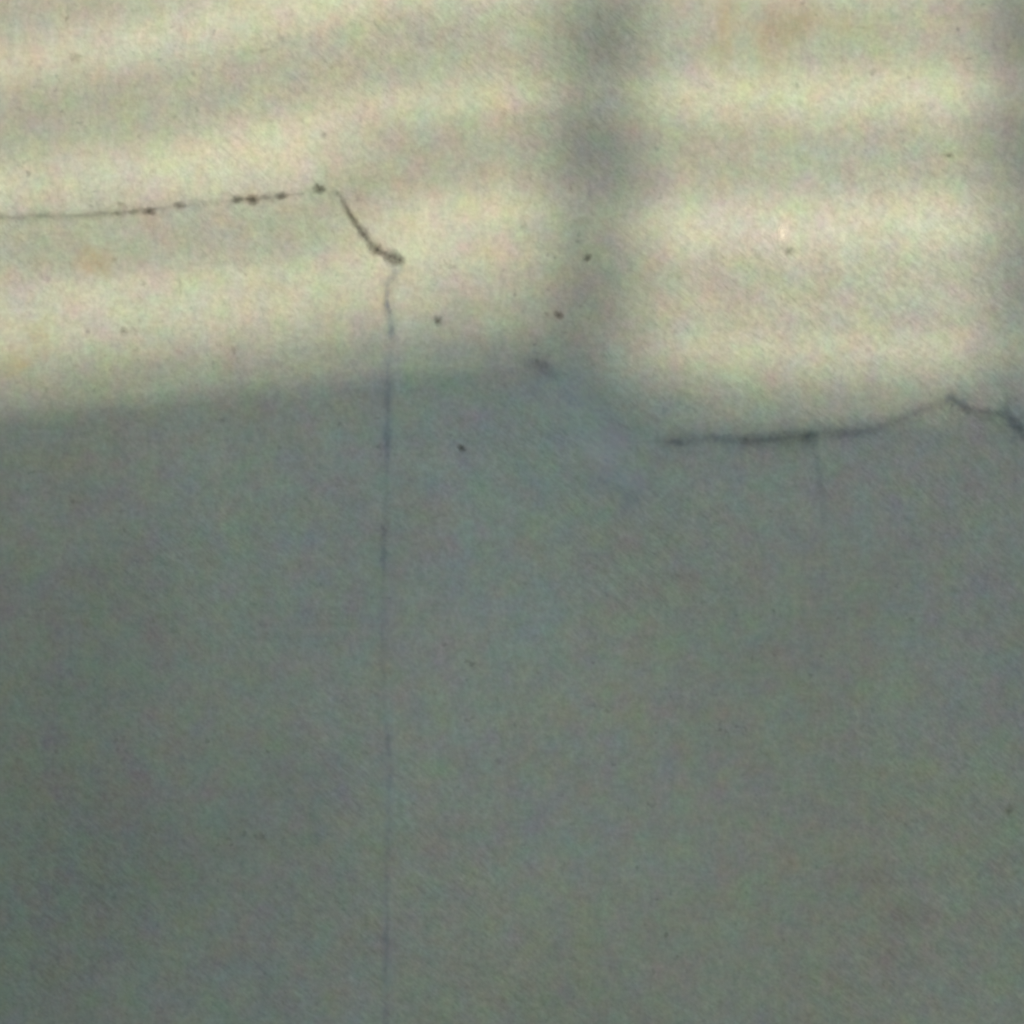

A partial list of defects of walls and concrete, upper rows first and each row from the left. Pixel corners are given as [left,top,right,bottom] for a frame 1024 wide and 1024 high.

crack [348,211,401,262]